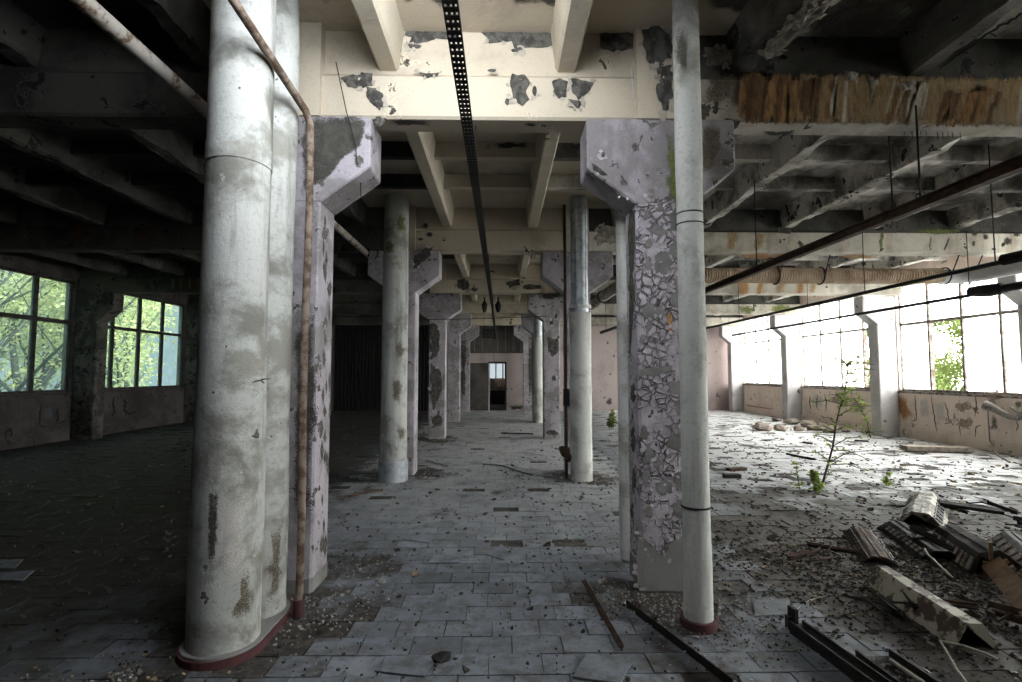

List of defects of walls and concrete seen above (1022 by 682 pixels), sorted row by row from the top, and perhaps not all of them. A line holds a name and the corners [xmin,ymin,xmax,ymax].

peeling [403,31,461,52]
peeling [481,32,552,57]
spalling [754,0,841,68]
spalling [340,71,430,127]
peeling [414,68,442,80]
spalling [505,73,540,106]
spalling [552,74,596,112]
spalling [593,25,685,122]
peeling [427,323,443,427]
damp [207,488,251,596]